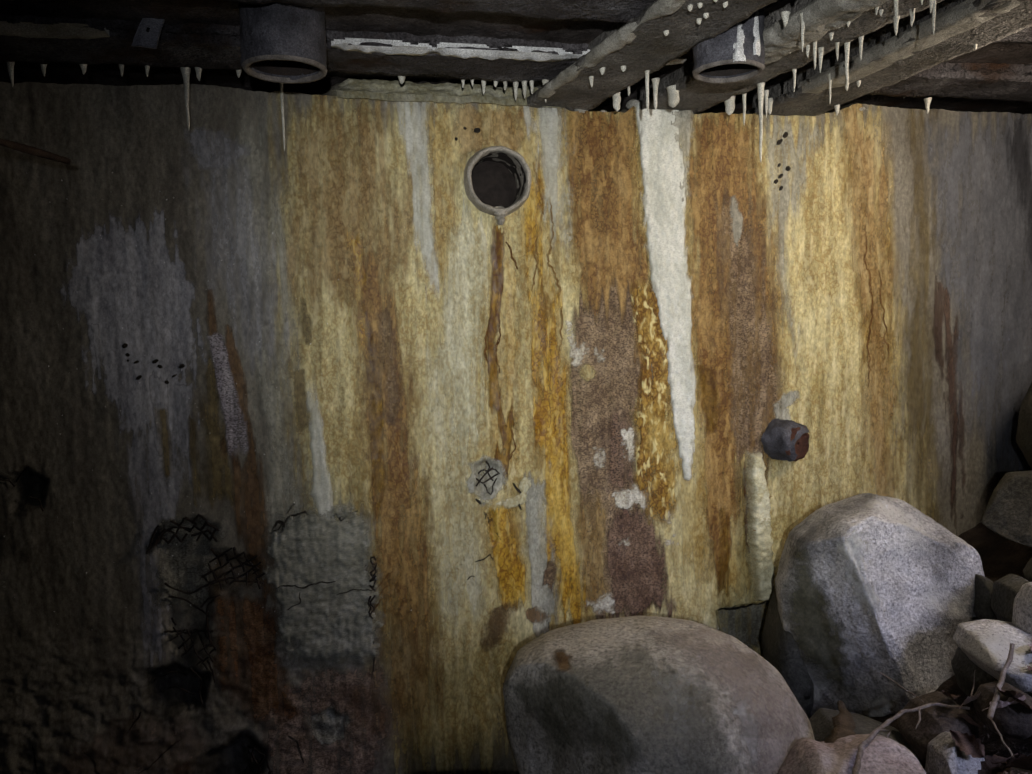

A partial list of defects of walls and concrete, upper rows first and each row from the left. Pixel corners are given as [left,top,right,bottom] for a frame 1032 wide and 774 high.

spalling [145,514,265,639]
crack [270,504,308,534]
rust [288,100,435,644]
spalling [467,457,531,510]
rust [429,103,676,624]
leakage [275,0,888,774]
rust [687,112,784,600]
leakage [884,266,935,519]